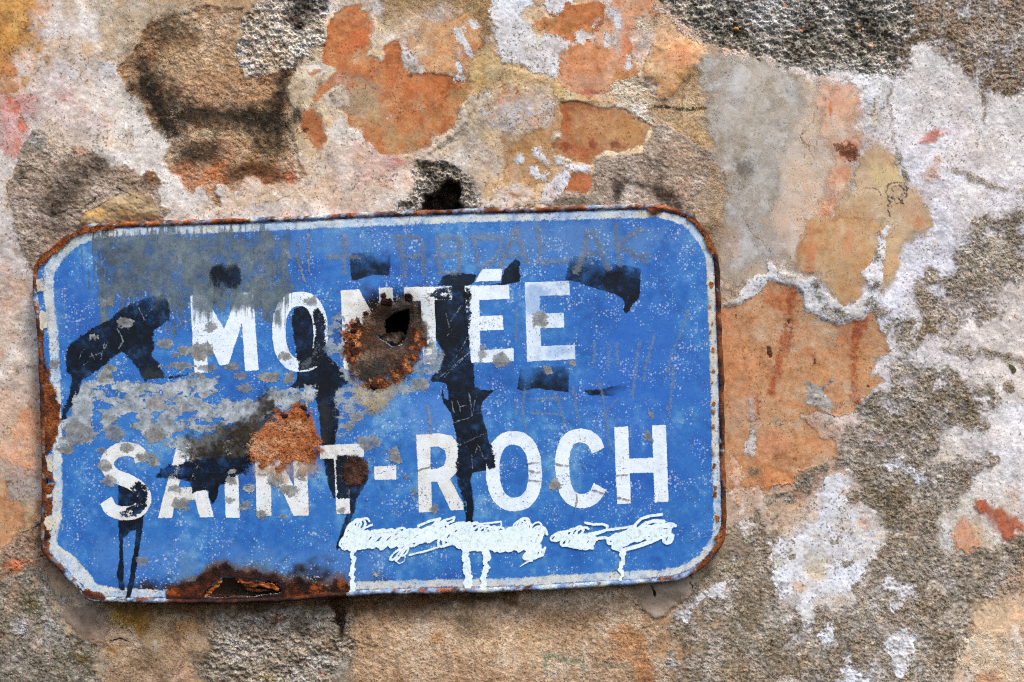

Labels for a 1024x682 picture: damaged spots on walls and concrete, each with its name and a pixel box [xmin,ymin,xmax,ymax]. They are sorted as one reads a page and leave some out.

spalling [0,0,171,270]
damp [127,56,303,180]
spalling [96,0,1024,506]
peeling [941,515,981,555]
peeling [974,499,1024,541]
peeling [882,575,918,613]
peeling [102,577,728,682]
peeling [837,661,875,682]
peeling [881,626,918,678]
peeling [956,620,1024,682]